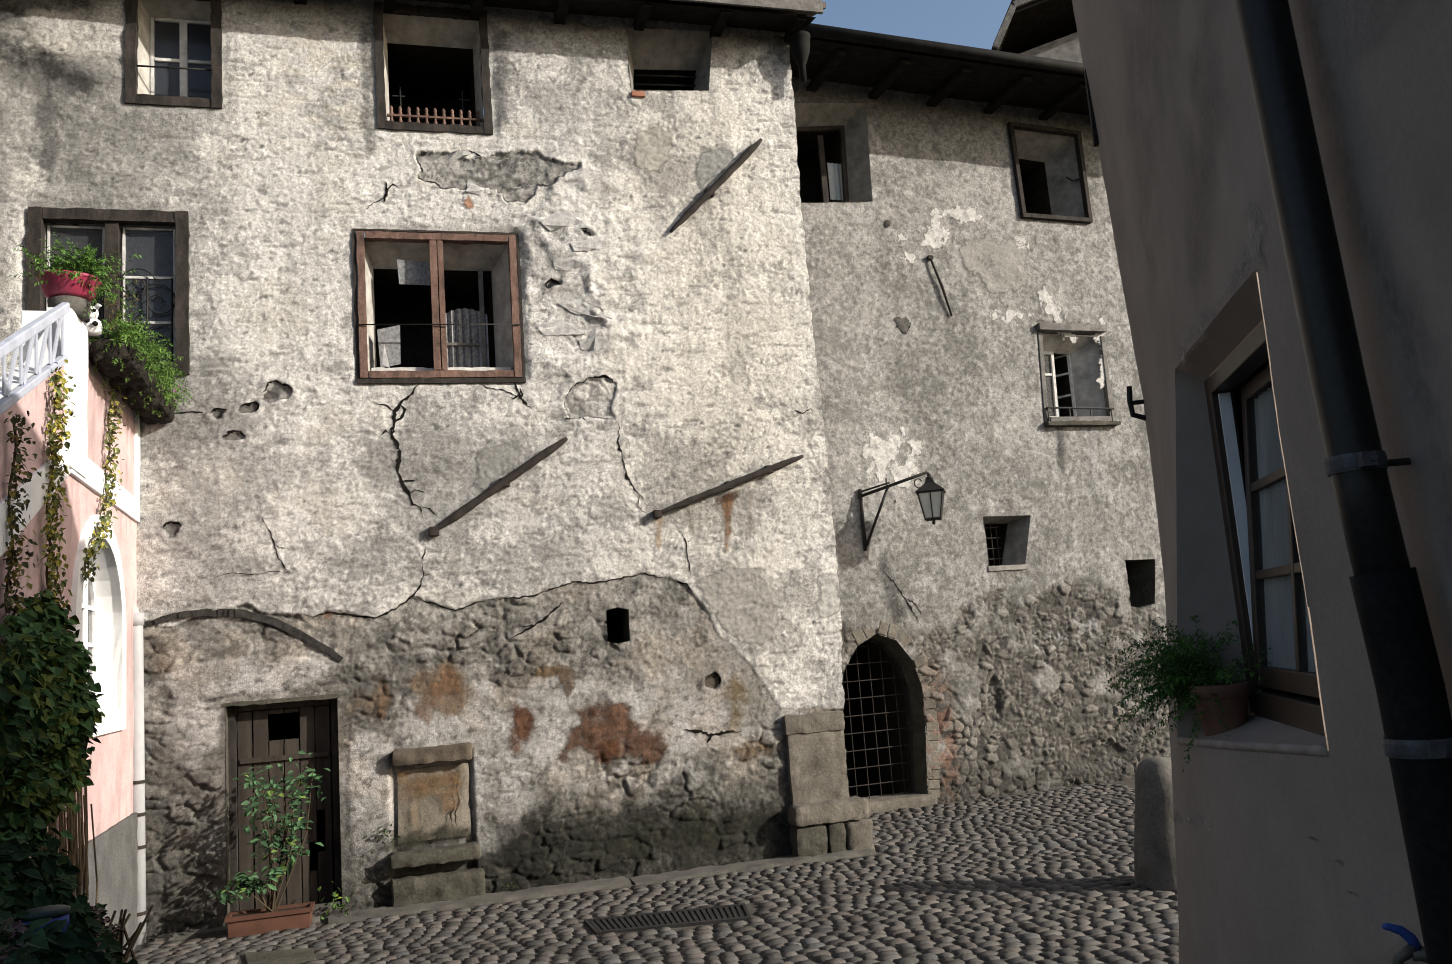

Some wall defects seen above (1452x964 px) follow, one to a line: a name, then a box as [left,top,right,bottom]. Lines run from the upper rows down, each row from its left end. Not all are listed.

damp [0,0,91,169]
crack [366,181,397,209]
flaking render [416,150,580,203]
peeling [885,205,983,263]
flaking render [211,380,292,440]
crack [304,383,693,639]
corrosion [717,491,739,549]
corrosion [411,661,473,722]
corrosion [511,703,535,753]
corrosion [535,664,667,764]
flaking render [705,671,721,689]